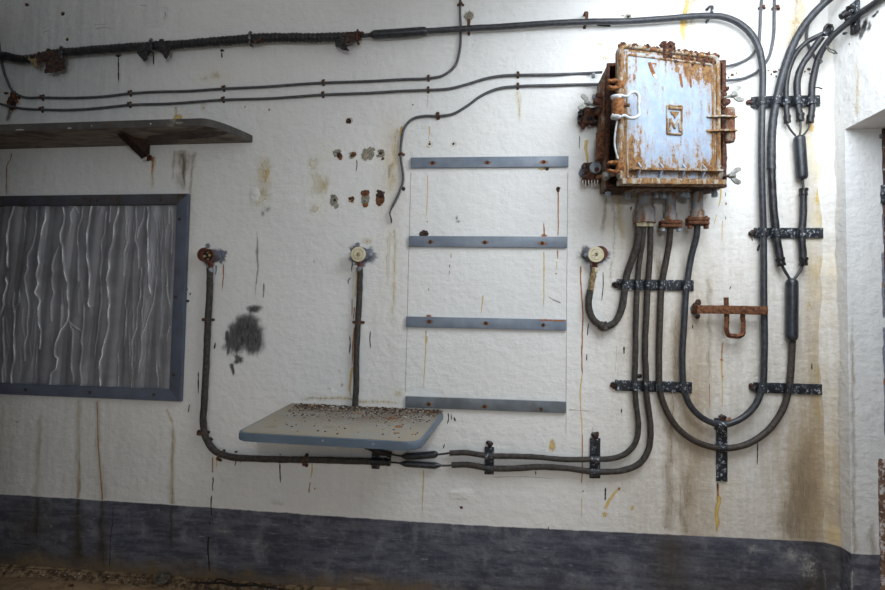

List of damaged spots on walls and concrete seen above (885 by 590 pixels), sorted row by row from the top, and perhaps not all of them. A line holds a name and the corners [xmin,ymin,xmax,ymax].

water stain [680,0,689,39]
spalling [332,146,386,161]
spalling [329,189,386,209]